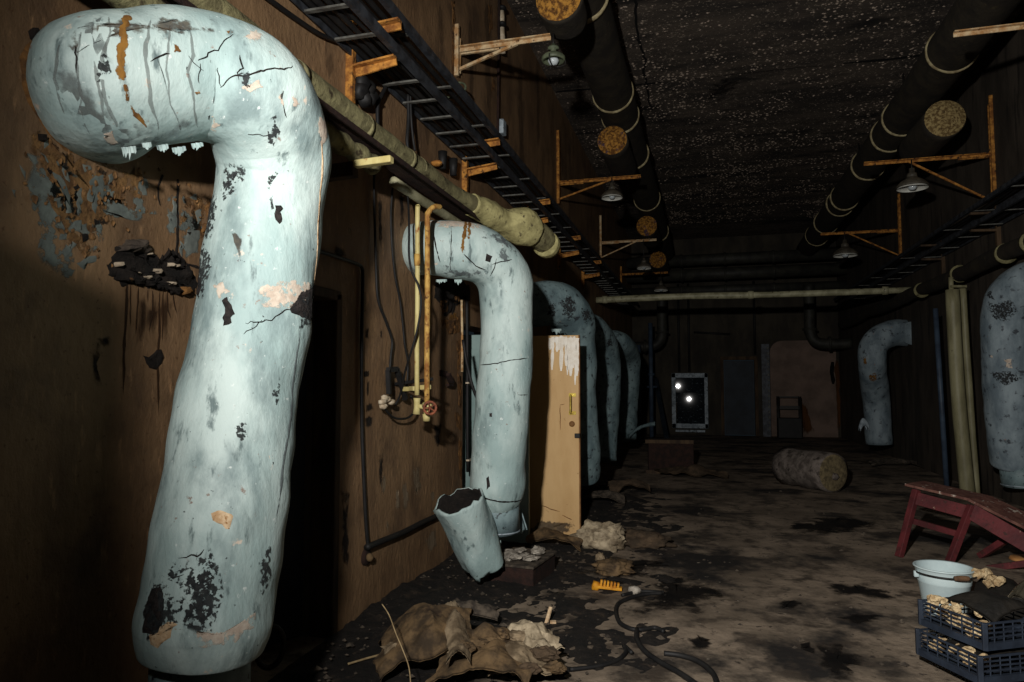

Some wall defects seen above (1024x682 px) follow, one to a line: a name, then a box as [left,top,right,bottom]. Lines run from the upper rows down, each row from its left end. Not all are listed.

corrosion [115,15,146,127]
crack [151,34,293,119]
peeling [12,20,210,295]
corrosion [461,222,471,262]
peeling [259,280,310,308]
crack [244,309,291,334]
flaking render [149,622,177,648]